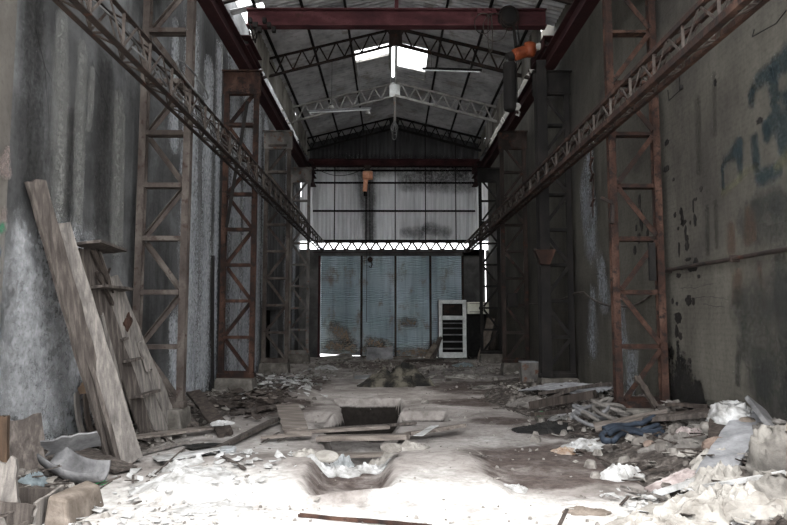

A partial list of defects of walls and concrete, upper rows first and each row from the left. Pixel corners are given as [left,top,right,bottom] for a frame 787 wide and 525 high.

damp [24,0,44,175]
damp [0,228,96,440]
damp [53,17,125,249]
rust [325,321,436,357]
damp [360,167,471,239]
damp [580,147,609,358]
spalling [673,186,703,278]
damp [668,341,708,410]